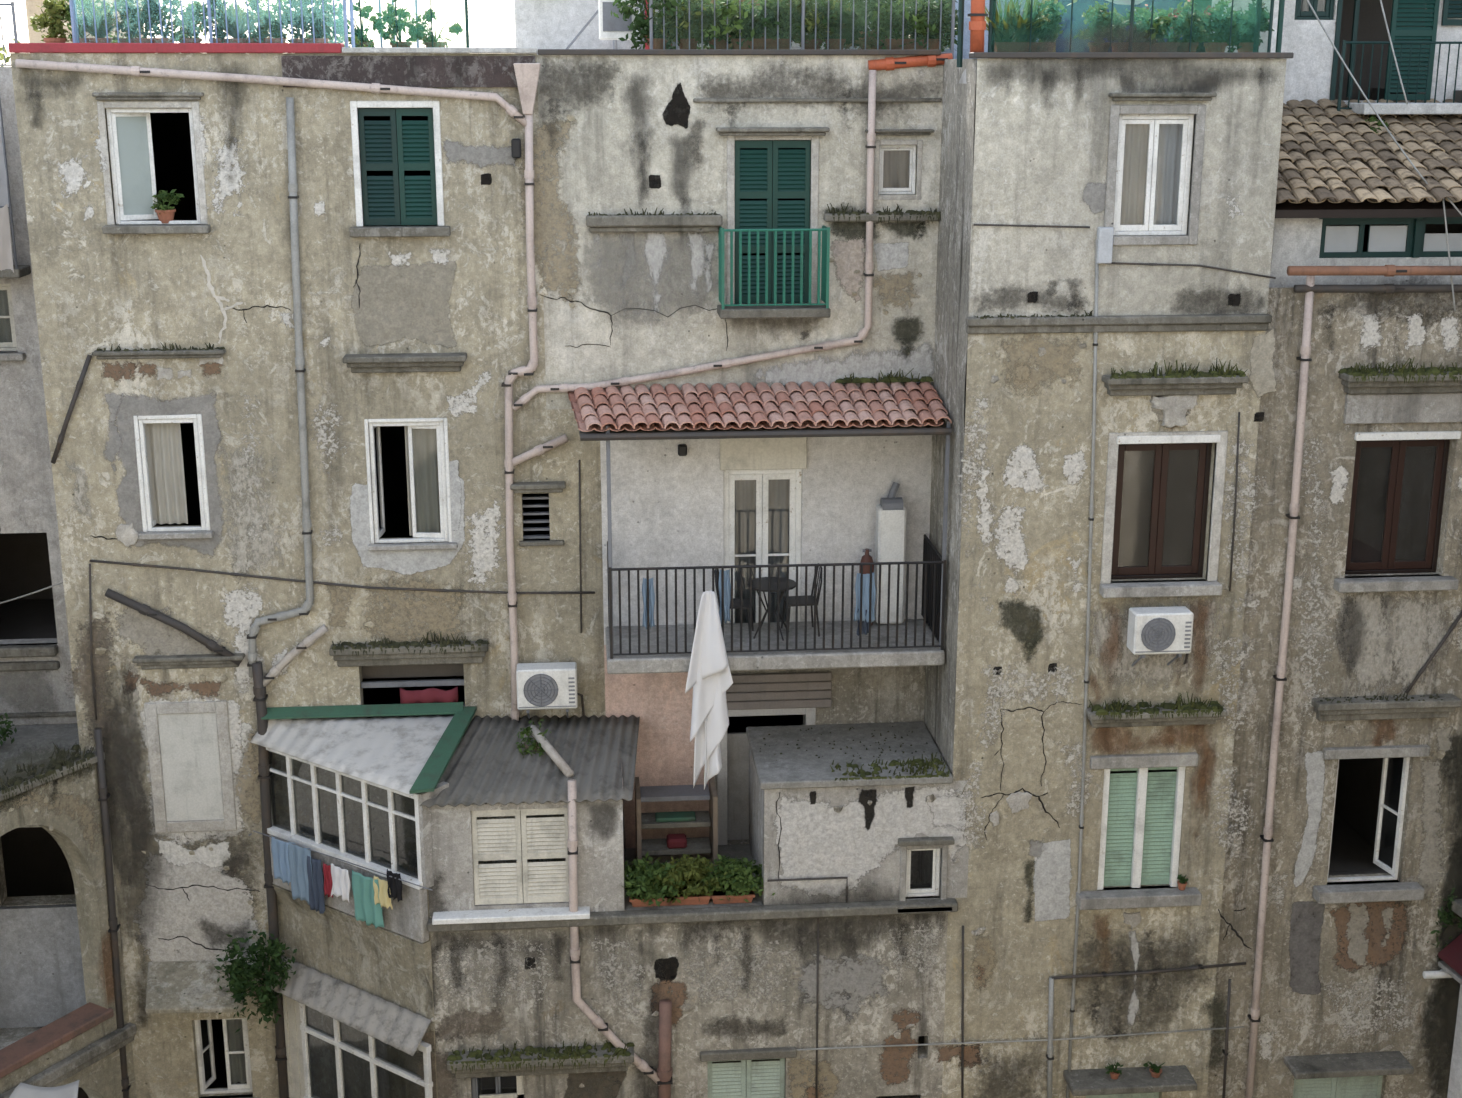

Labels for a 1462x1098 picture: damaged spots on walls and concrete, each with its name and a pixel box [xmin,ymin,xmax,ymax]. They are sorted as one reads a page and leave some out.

spalling [663,83,691,129]
spalling [649,175,661,189]
crack [200,255,290,344]
crack [540,294,728,351]
peeling [1404,313,1460,352]
peeling [955,333,1088,597]
flaking render [328,460,505,643]
water stain [999,601,1043,660]
flaking render [65,584,289,966]
crack [981,701,1082,840]
spalling [1322,901,1416,1043]
water stain [1421,735,1462,1098]